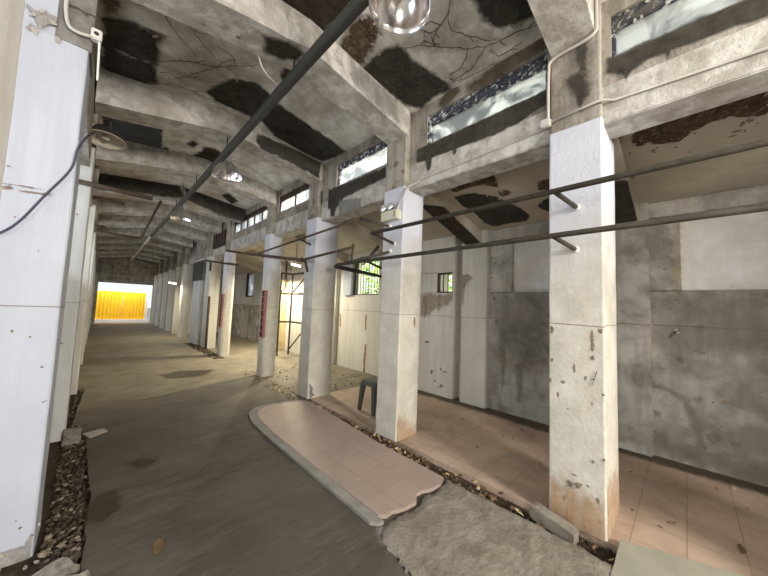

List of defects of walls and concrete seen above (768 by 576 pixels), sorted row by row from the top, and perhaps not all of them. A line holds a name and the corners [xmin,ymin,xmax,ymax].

peeling [25,4,57,35]
spalling [100,18,160,84]
spalling [103,116,164,148]
crack [135,4,256,102]
spalling [207,79,269,117]
spalling [262,105,345,161]
spalling [341,14,451,108]
crack [404,0,536,83]
water stain [567,42,589,108]
peeling [628,91,768,165]
spalling [449,175,529,226]